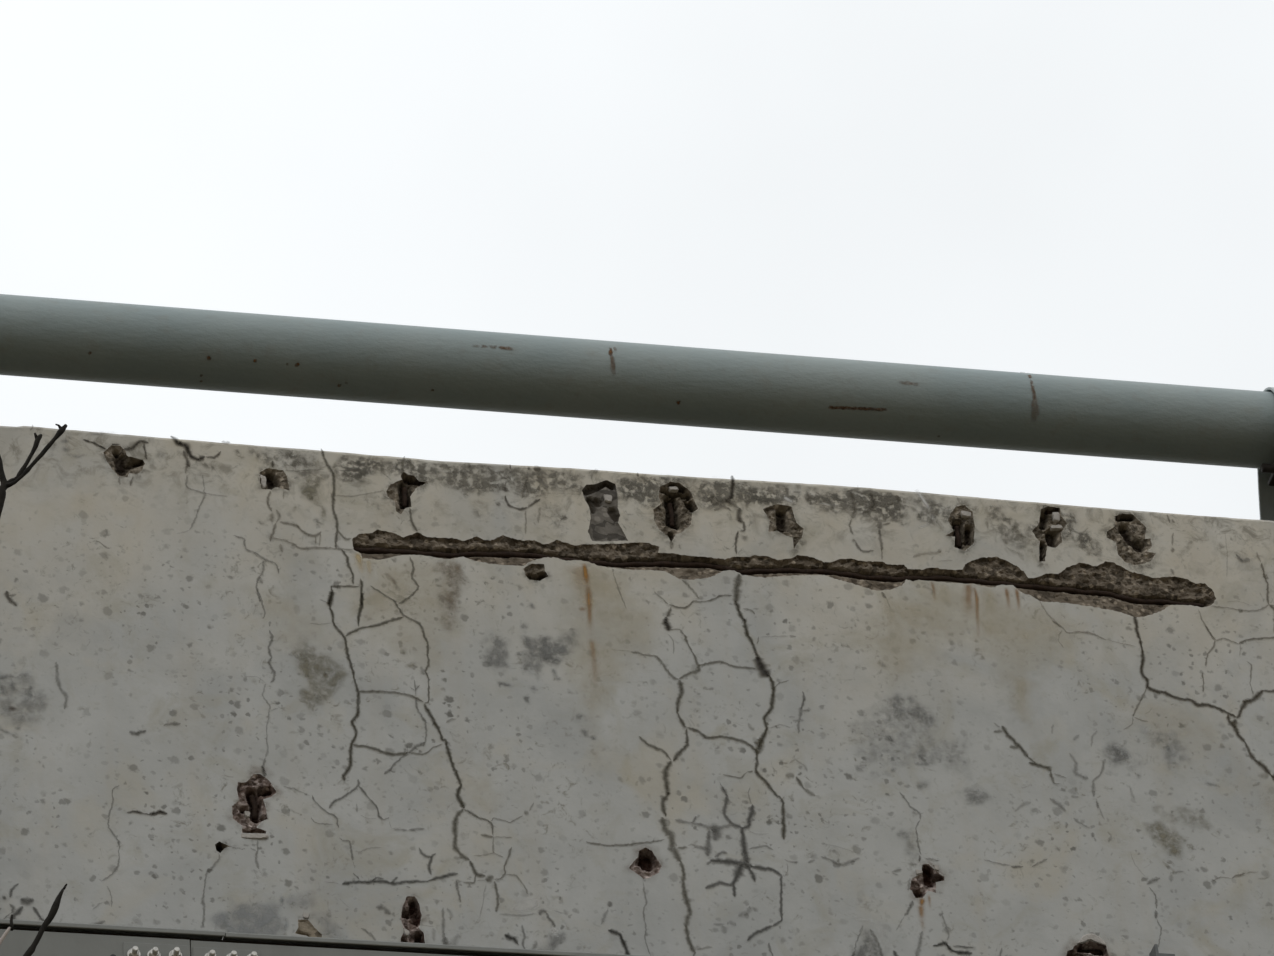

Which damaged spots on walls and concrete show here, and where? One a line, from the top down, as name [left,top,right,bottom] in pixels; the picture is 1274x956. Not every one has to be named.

spalling [83,439,148,485]
crack [171,436,229,512]
crack [497,465,540,510]
spalling [352,472,1216,618]
crack [236,449,518,945]
crack [588,476,815,956]
crack [1134,556,1274,780]
crack [994,726,1063,808]
spalling [215,774,276,853]
spalling [401,896,425,943]
spalling [629,847,661,879]
spalling [910,864,944,898]